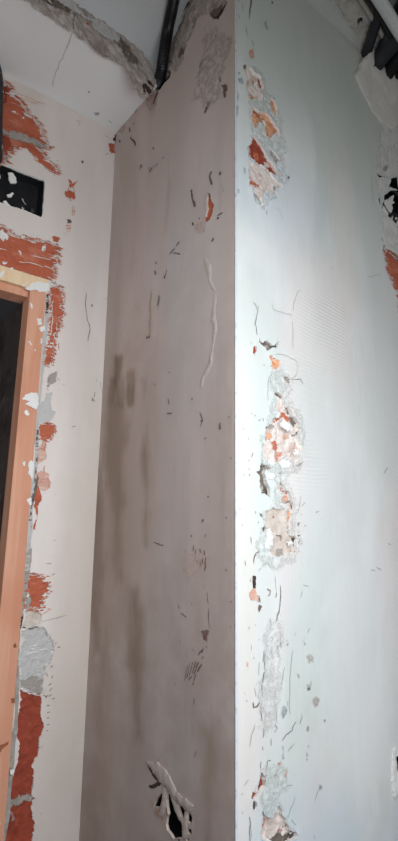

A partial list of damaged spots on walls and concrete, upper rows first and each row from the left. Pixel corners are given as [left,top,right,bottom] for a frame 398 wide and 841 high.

spalling [44,0,71,13]
spalling [118,38,139,64]
spalling [211,2,227,19]
flaking render [0,80,63,176]
spalling [237,49,290,213]
flaking render [0,224,67,368]
flaking render [382,249,398,297]
flaking render [33,422,58,530]
spalling [253,338,305,569]
flaking render [22,572,55,612]
flaking render [5,690,43,841]
spalling [251,760,295,841]